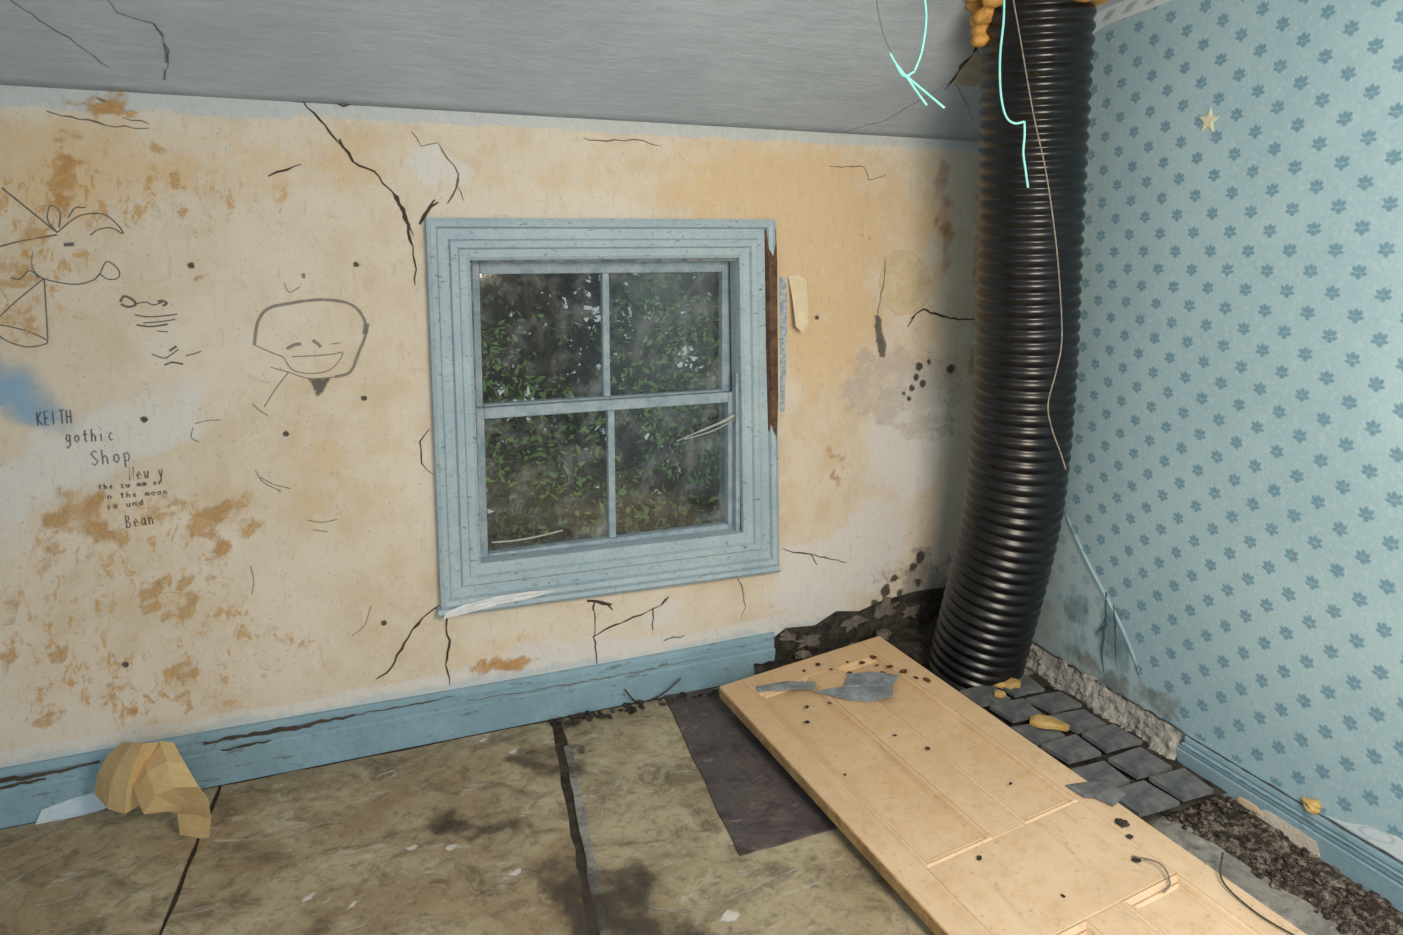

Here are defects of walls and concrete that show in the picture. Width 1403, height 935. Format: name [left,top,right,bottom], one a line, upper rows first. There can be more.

crack [11,0,149,129]
crack [108,0,170,80]
crack [268,164,301,177]
crack [302,102,464,285]
water stain [902,359,954,401]
crack [782,548,846,565]
water stain [871,551,925,605]
crack [376,605,451,684]
crack [587,596,685,664]